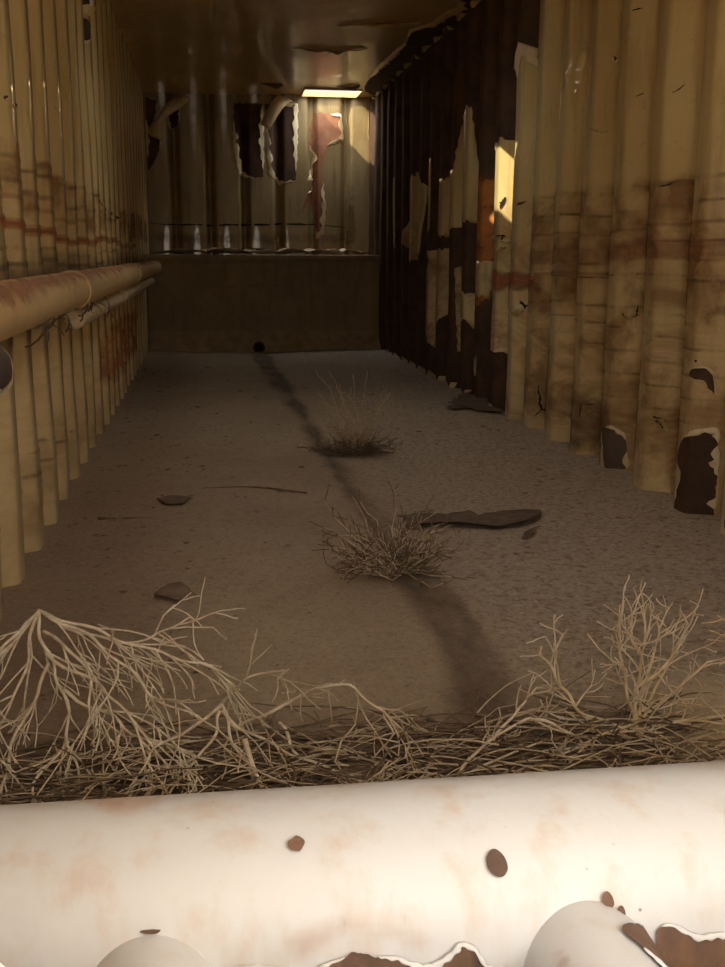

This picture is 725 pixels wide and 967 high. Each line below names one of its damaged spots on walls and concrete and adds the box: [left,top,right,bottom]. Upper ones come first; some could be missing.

peeling [232,83,344,239]
peeling [337,0,540,412]
rust [3,216,136,249]
peeling [0,347,13,394]
peeling [689,360,717,396]
peeling [601,425,630,469]
peeling [674,427,725,528]
peeling [602,891,725,967]
peeling [318,942,492,967]